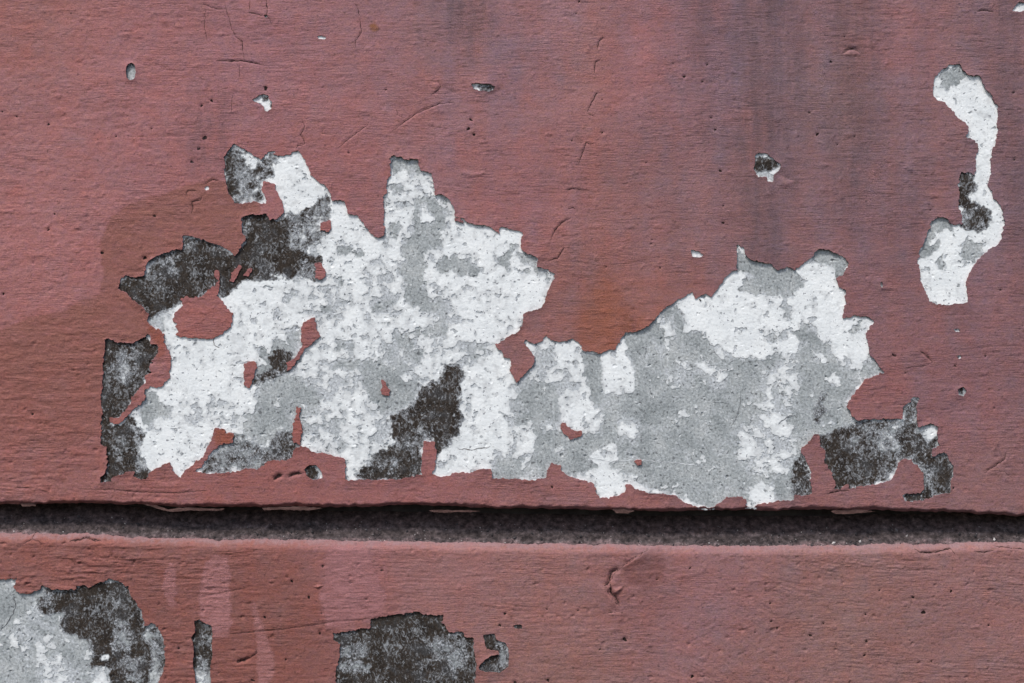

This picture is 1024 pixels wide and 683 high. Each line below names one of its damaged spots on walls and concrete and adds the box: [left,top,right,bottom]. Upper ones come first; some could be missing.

peeling [917,64,1005,305]
peeling [111,144,952,510]
peeling [0,578,180,683]
peeling [195,661,211,683]
peeling [340,644,370,672]